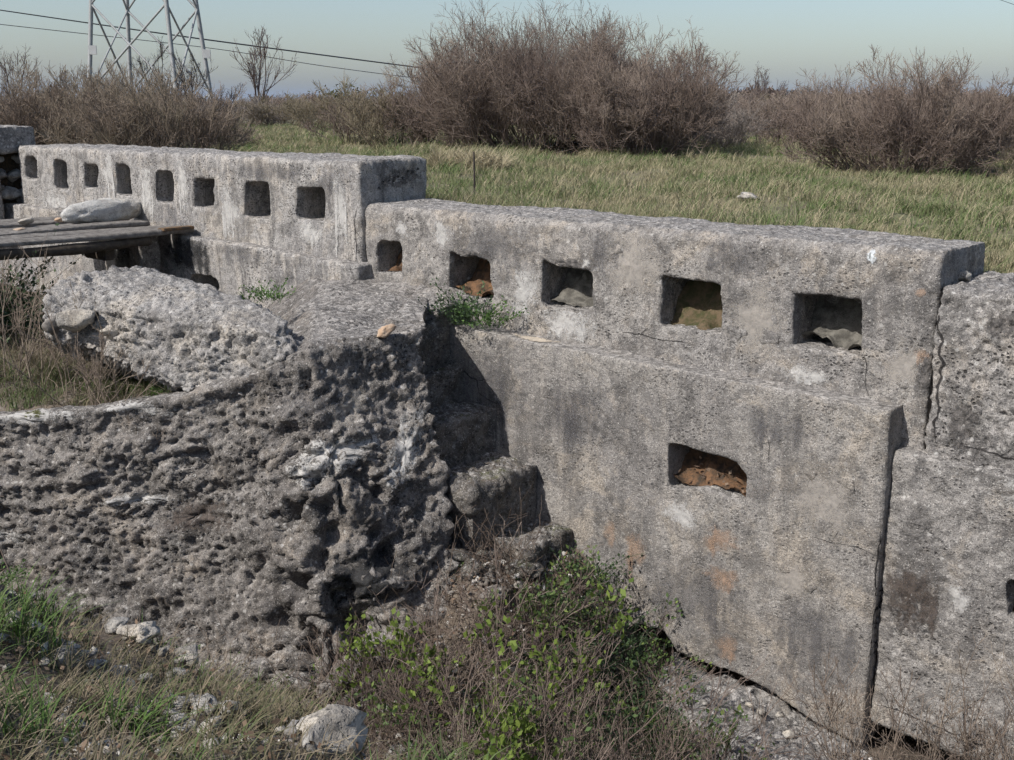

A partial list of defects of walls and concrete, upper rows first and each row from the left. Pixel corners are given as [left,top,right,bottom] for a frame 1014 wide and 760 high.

peeling [387,409,424,486]
crack [932,316,1014,460]
crack [815,529,887,683]
crack [885,706,986,746]